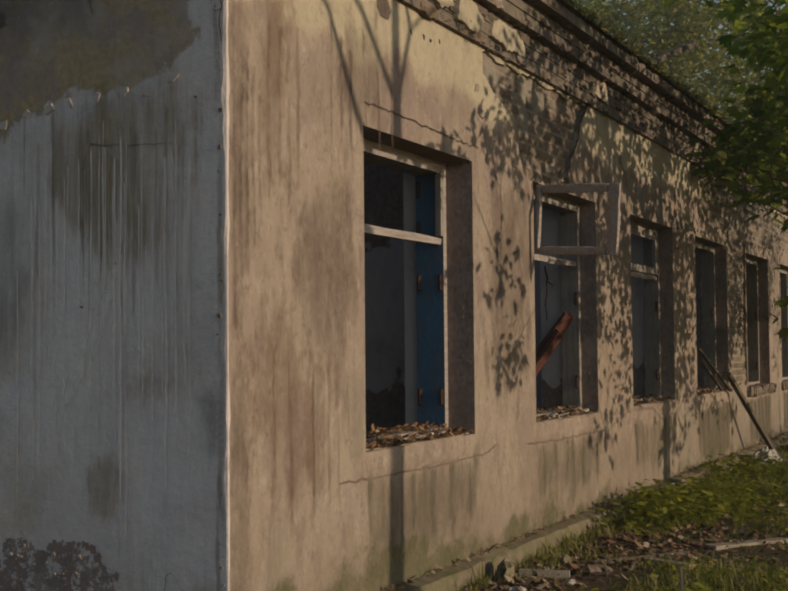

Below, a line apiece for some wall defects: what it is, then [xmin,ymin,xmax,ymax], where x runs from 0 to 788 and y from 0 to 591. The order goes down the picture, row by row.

crack [212,0,222,42]
spalling [378,0,391,19]
spalling [474,52,583,185]
damp [30,97,177,534]
spalling [698,173,788,389]